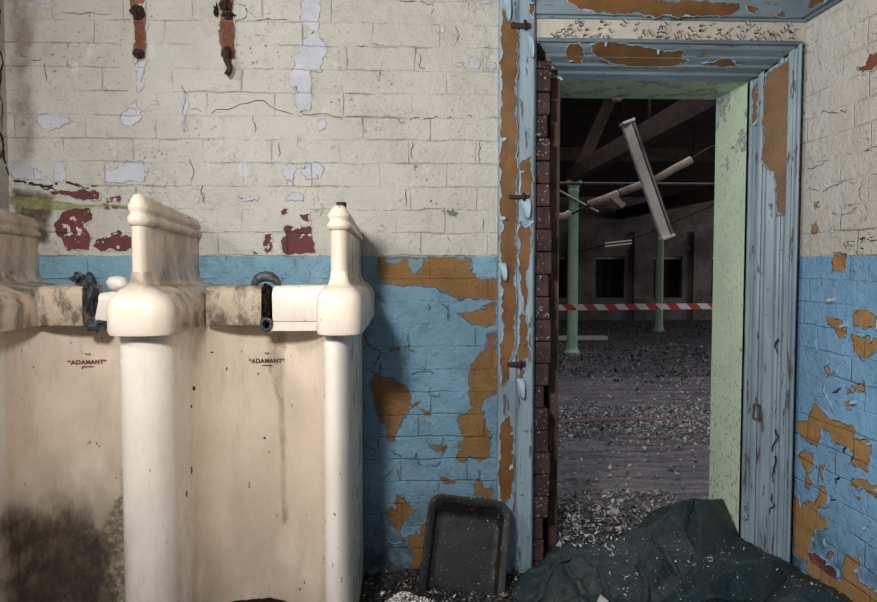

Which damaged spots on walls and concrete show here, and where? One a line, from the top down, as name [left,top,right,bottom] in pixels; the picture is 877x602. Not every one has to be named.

rust [134,21,144,59]
rust [221,21,234,61]
peeling [565,42,690,68]
peeling [567,0,761,19]
peeling [856,53,877,76]
crack [0,51,98,190]
peeling [750,59,793,217]
peeling [8,159,149,252]
peeling [250,160,325,256]
peeling [369,0,536,503]
peeling [826,308,877,362]
peeling [791,403,877,602]